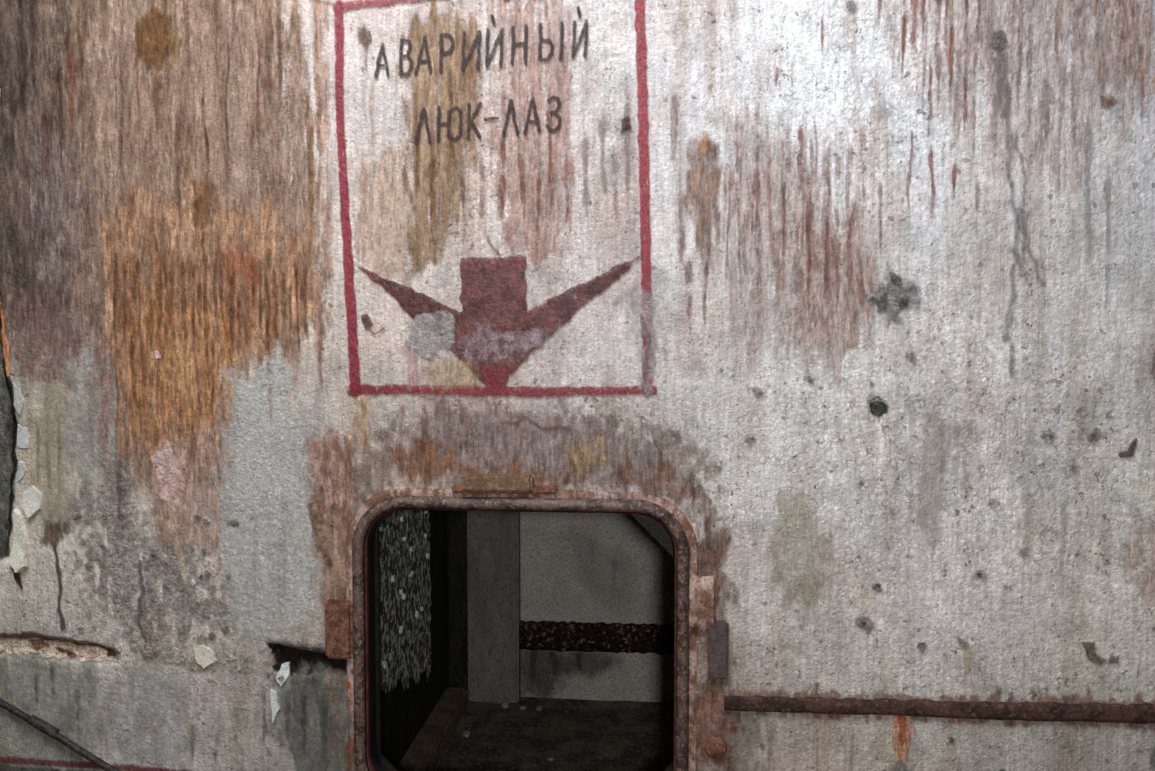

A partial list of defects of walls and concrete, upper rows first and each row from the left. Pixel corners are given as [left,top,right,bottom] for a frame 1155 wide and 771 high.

rust [0,0,331,568]
rust [356,0,588,282]
rust [599,92,630,205]
rust [671,96,882,383]
rust [897,0,1155,186]
spalling [0,302,44,588]
peeling [0,345,347,723]
rust [300,358,738,626]
rust [695,633,1155,771]